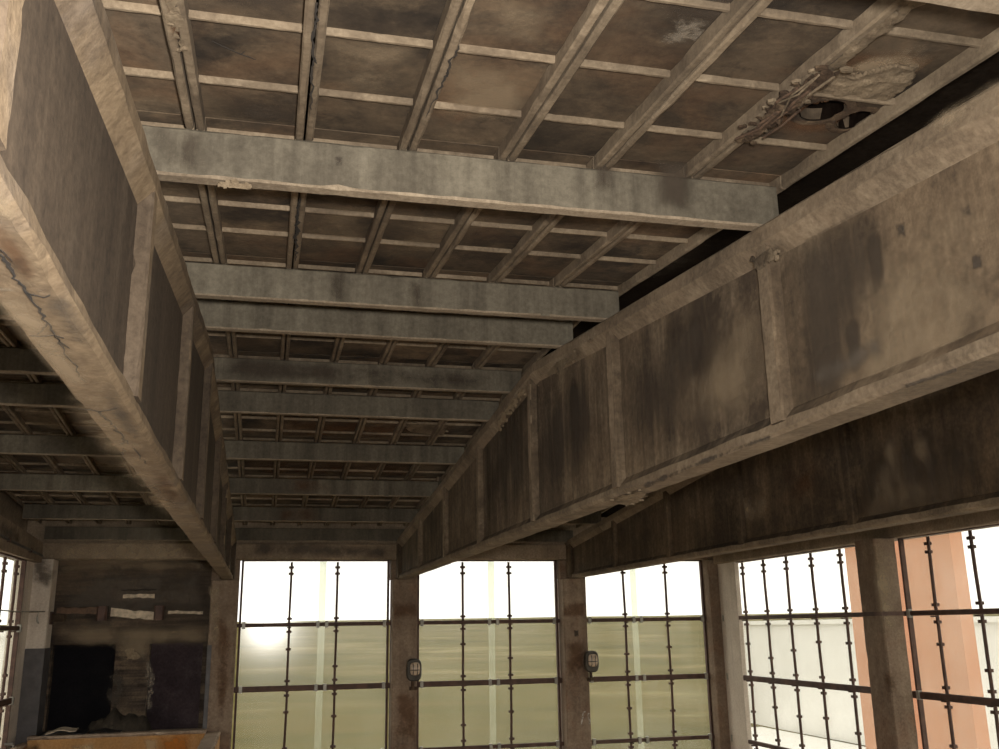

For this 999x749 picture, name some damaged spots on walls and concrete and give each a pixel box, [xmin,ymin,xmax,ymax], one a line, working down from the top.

spalling [735,0,926,145]
crack [0,249,85,381]